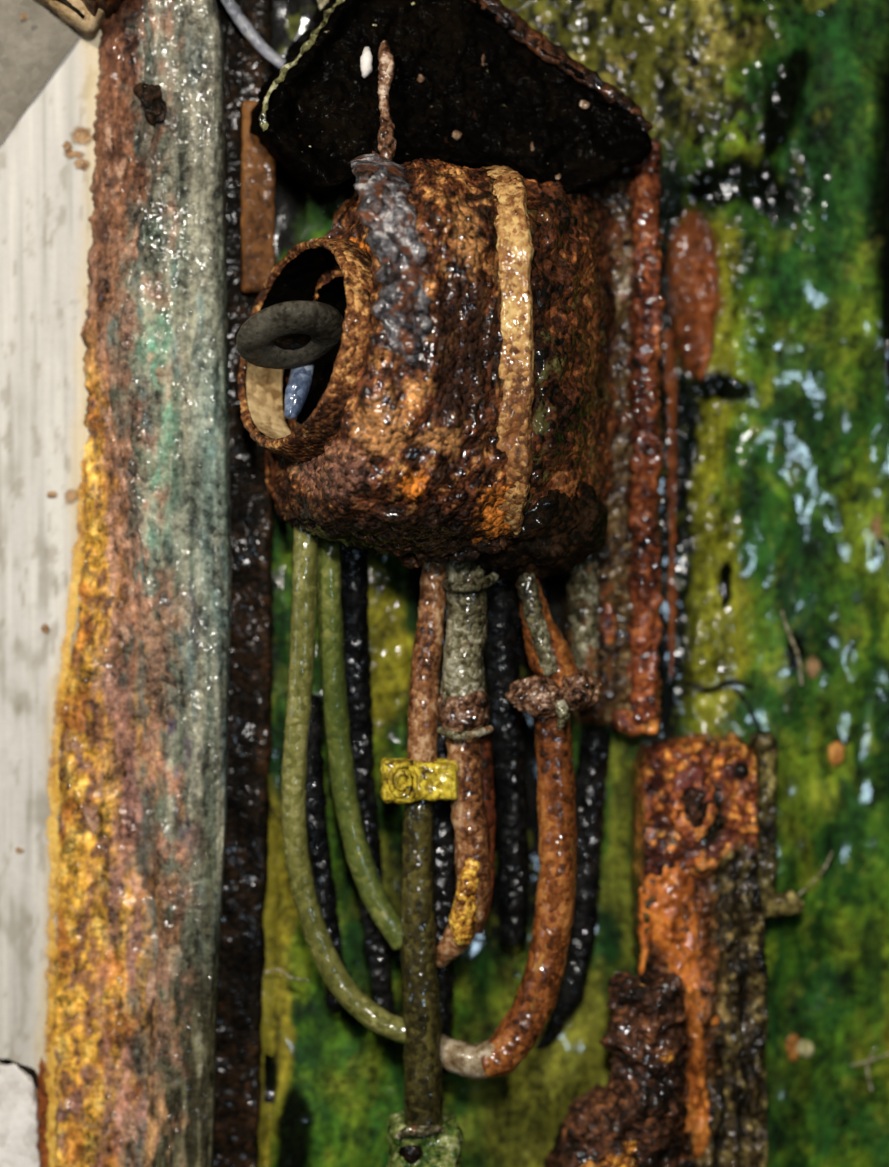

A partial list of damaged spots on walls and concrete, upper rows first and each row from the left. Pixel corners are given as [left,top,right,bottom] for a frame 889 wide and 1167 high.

leakage [688,48,809,209]
leakage [873,52,889,379]
rust [661,209,721,677]
leakage [692,371,754,402]
rust [37,0,158,1167]
leakage [718,561,732,609]
rust [449,858,480,946]
rust [638,861,720,1158]
rust [580,1141,638,1167]